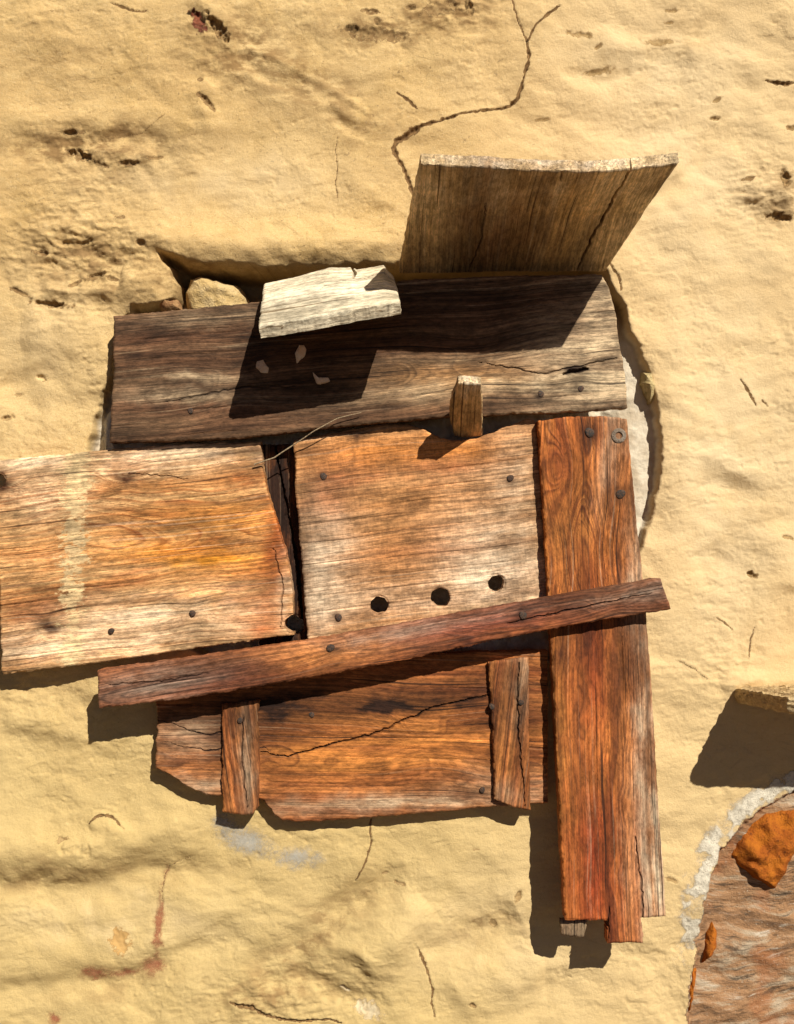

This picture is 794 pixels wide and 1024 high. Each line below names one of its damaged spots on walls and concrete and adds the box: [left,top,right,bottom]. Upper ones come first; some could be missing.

crack [391,0,560,194]
crack [355,819,373,881]
flaking render [667,771,794,1024]
crack [230,1001,342,1023]
crack [419,950,436,1017]